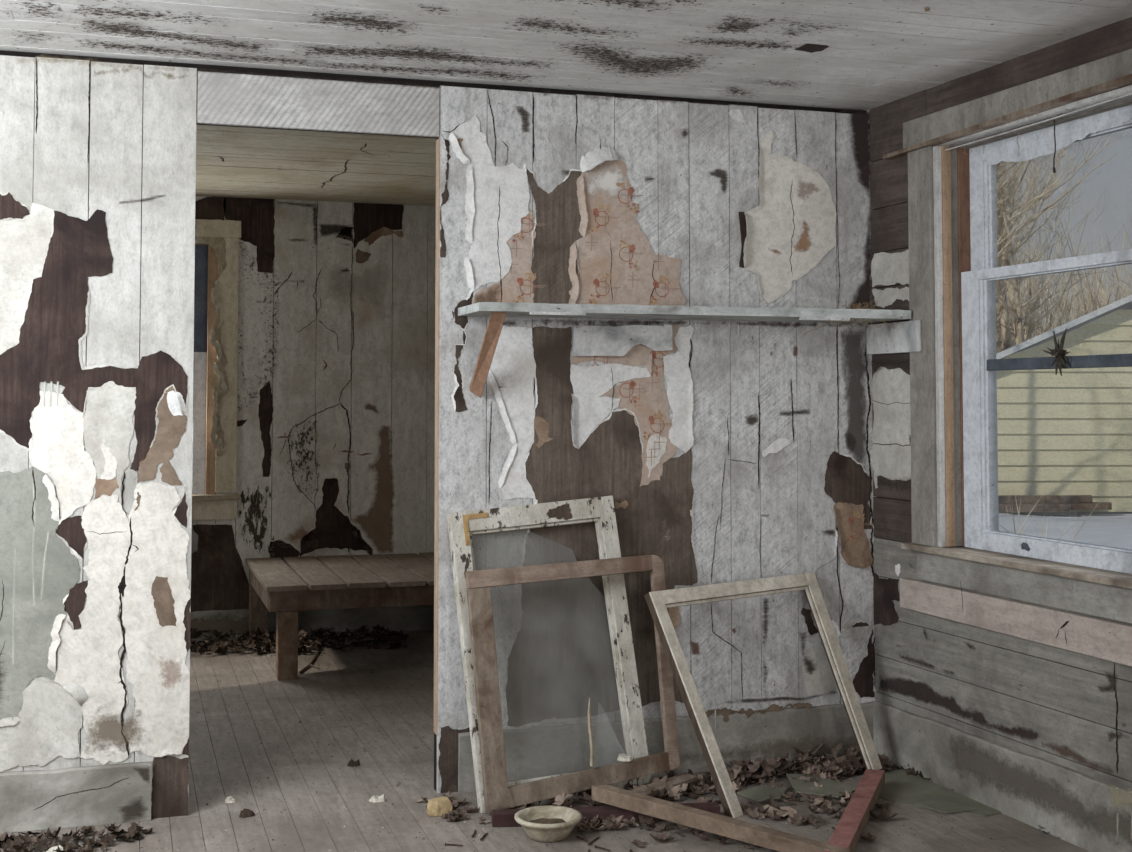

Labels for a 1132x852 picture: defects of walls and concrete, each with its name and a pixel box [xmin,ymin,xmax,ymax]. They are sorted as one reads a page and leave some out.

peeling [0,192,30,221]
crack [316,143,372,240]
peeling [524,164,588,304]
peeling [871,250,909,308]
peeling [0,209,189,480]
crack [274,248,354,514]
peeling [451,289,476,412]
peeling [55,515,88,560]
peeling [268,476,373,560]
peeling [820,367,911,698]
peeling [63,579,90,629]
crack [36,473,139,809]